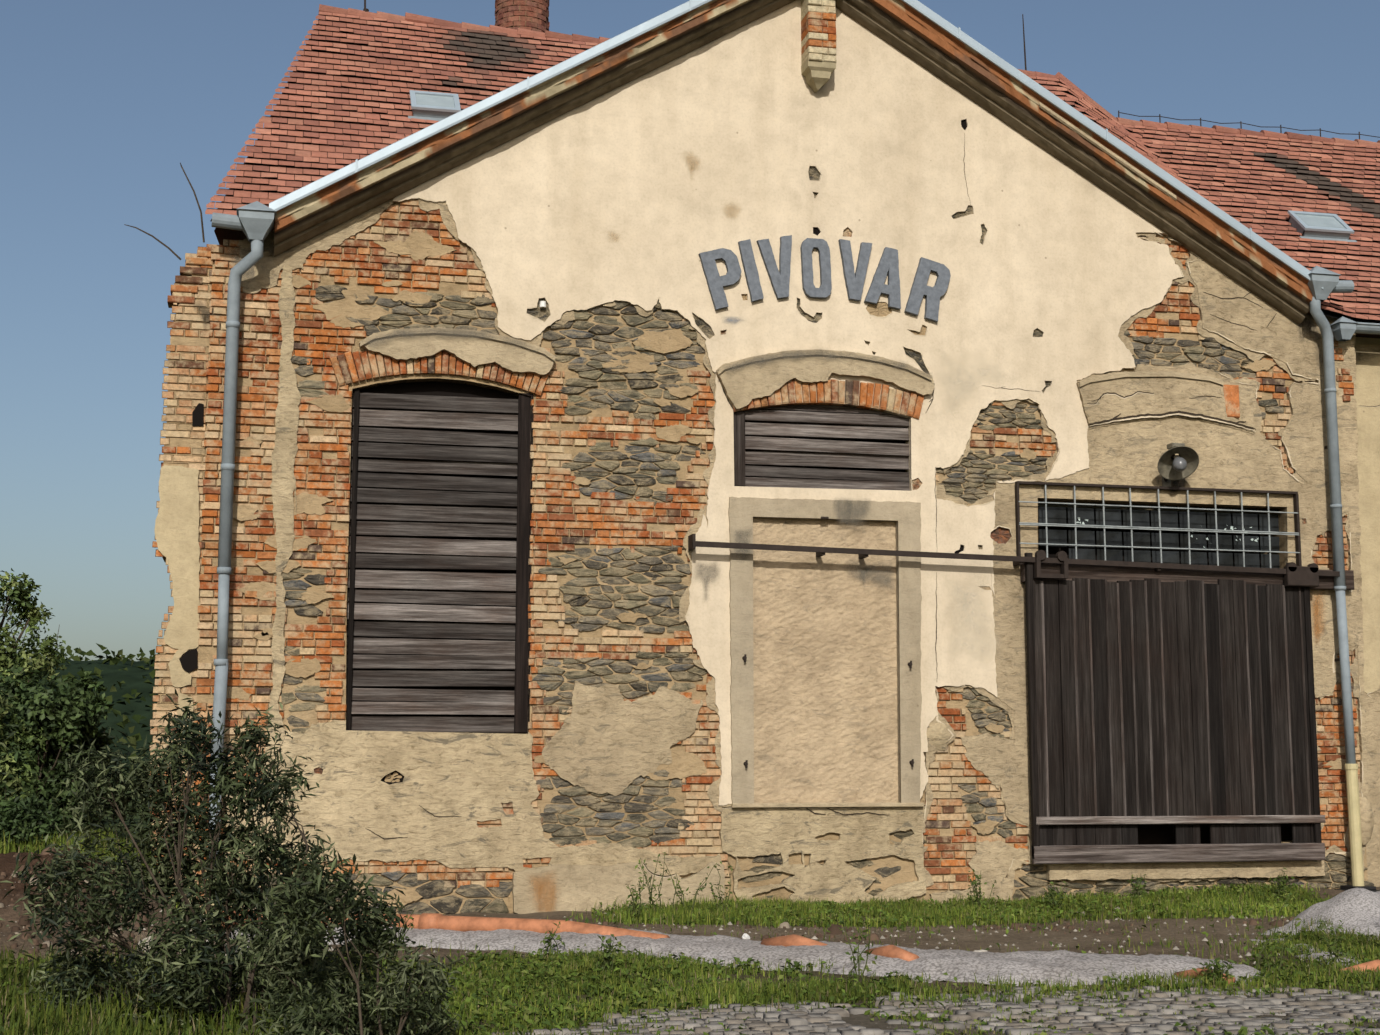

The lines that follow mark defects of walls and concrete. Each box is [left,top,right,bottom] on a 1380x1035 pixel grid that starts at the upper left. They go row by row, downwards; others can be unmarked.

flaking render [149,199,500,907]
flaking render [318,297,823,914]
flaking render [910,381,1060,507]
flaking render [1118,231,1354,484]
flaking render [1311,511,1352,570]
flaking render [847,859,901,896]
flaking render [890,645,1380,900]